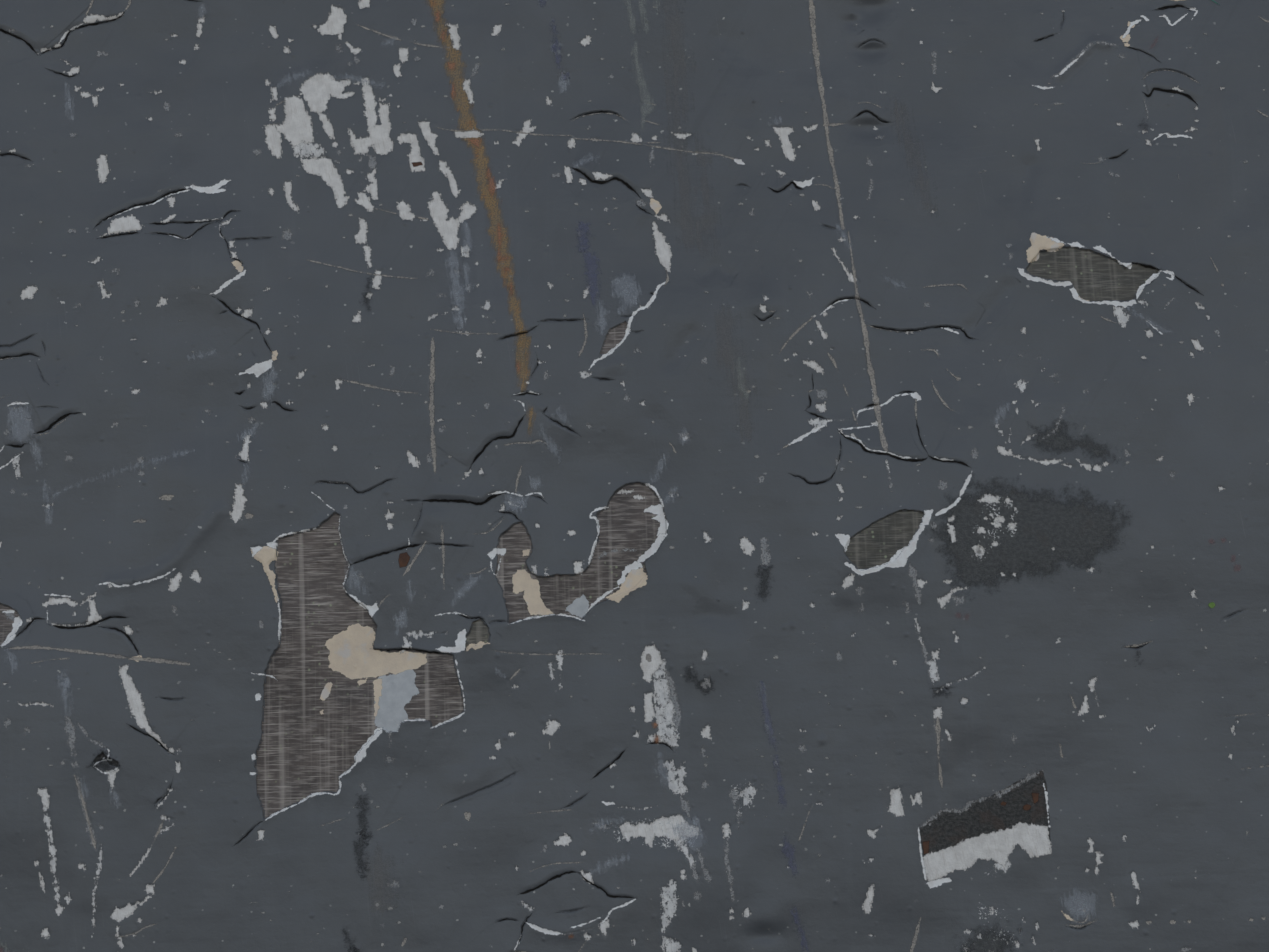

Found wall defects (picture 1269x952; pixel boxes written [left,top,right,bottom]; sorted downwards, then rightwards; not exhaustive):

crack [0,115,40,167]
crack [0,0,131,107]
peeling [253,0,481,323]
rust [429,0,530,391]
crack [779,261,985,489]
peeling [1006,222,1220,338]
peeling [235,419,680,869]
peeling [830,448,986,741]
peeling [61,655,192,938]
crack [438,740,515,806]
crack [494,702,691,952]
peeling [888,770,1053,889]